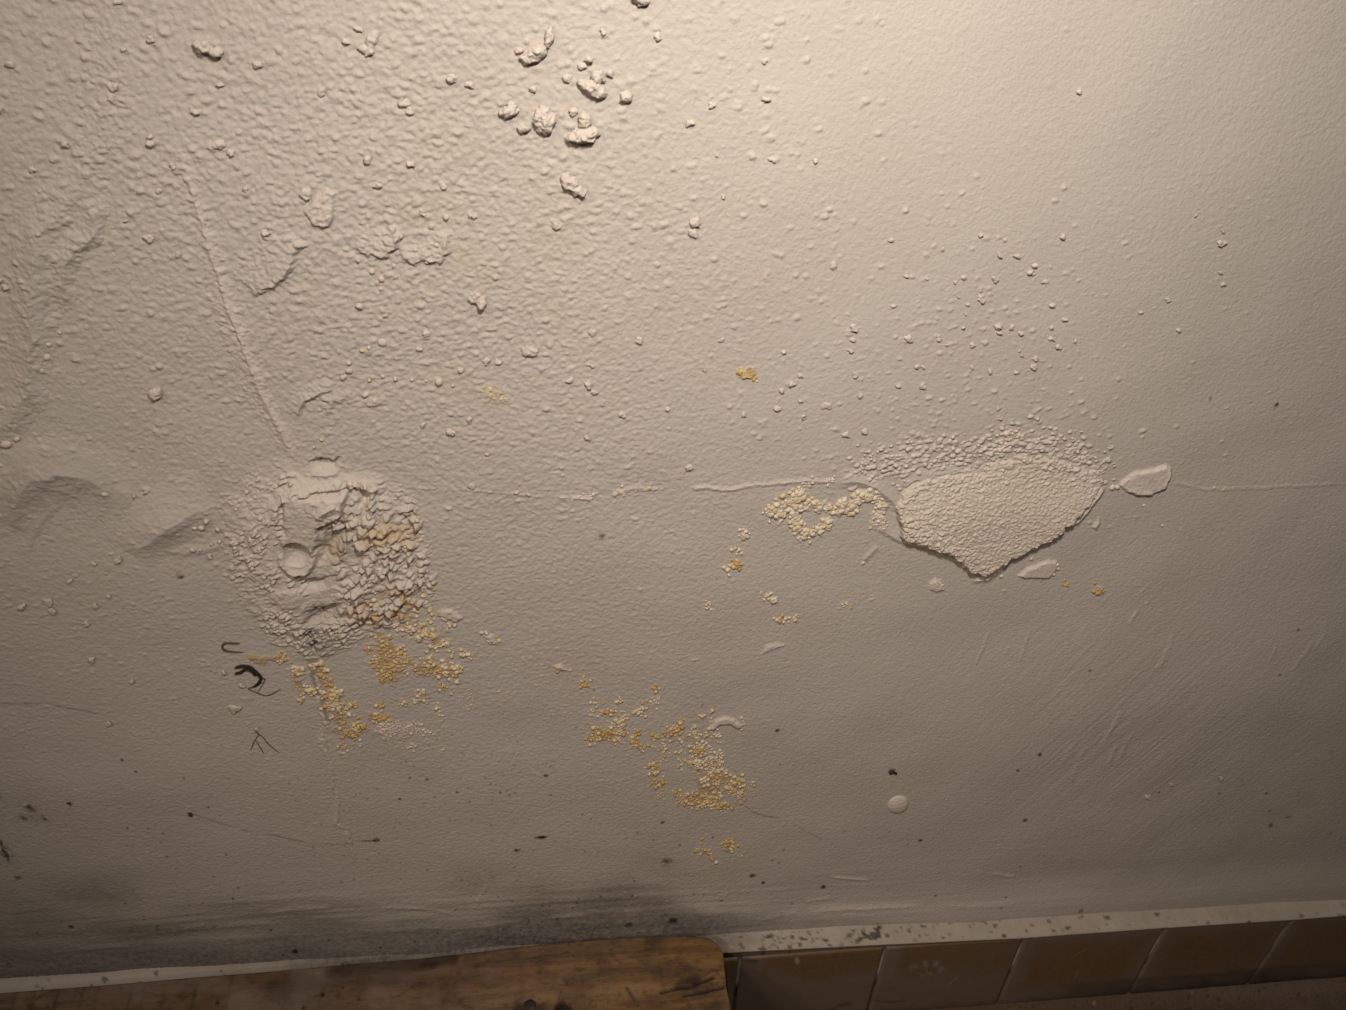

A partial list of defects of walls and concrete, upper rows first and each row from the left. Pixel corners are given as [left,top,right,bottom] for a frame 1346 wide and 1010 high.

spalling [218,339,464,662]
leakage [761,486,890,544]
leakage [247,586,474,754]
leakage [579,675,756,812]
leakage [0,787,907,979]